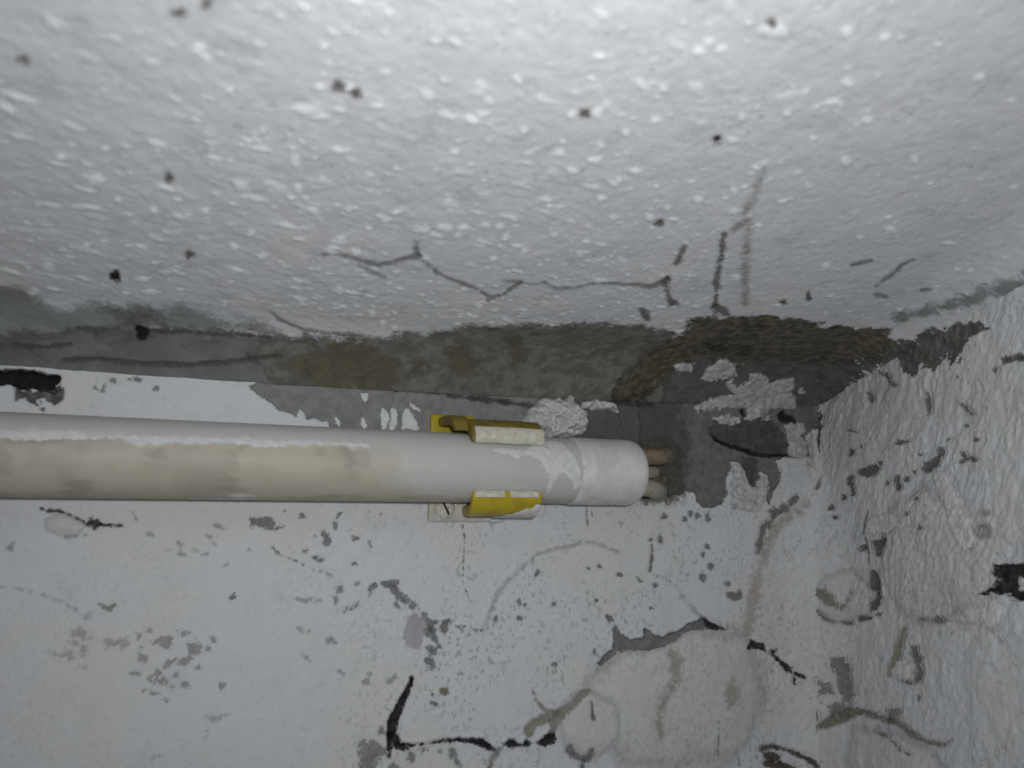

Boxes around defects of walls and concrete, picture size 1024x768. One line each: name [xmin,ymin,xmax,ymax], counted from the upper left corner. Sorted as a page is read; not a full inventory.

crack [322,242,669,301]
leakage [0,233,990,406]
leakage [1001,353,1024,365]
peeling [15,385,64,412]
peeling [248,382,544,432]
peeling [552,399,824,522]
peeling [828,438,950,520]
spalling [249,517,283,530]
spalling [858,537,886,556]
peeling [106,629,216,703]
crack [369,579,595,768]
crack [747,640,806,685]